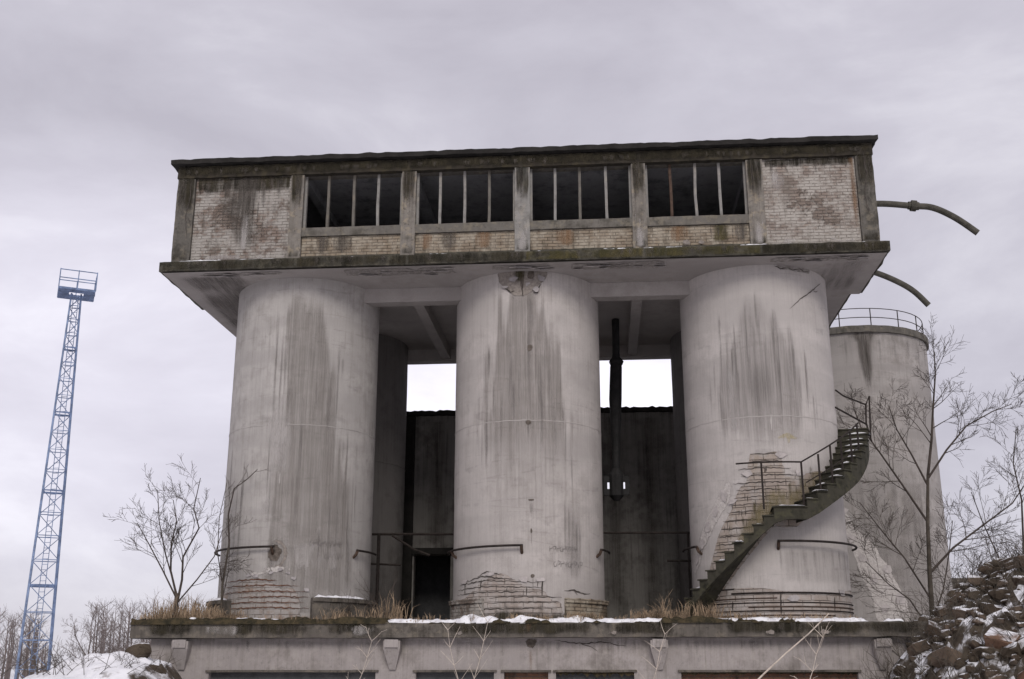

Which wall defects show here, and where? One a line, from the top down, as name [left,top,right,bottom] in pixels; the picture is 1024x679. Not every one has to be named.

leakage [292,174,302,201]
spalling [493,264,550,296]
leakage [854,333,872,379]
spalling [694,451,854,634]
spalling [219,540,309,619]
spalling [458,571,562,623]